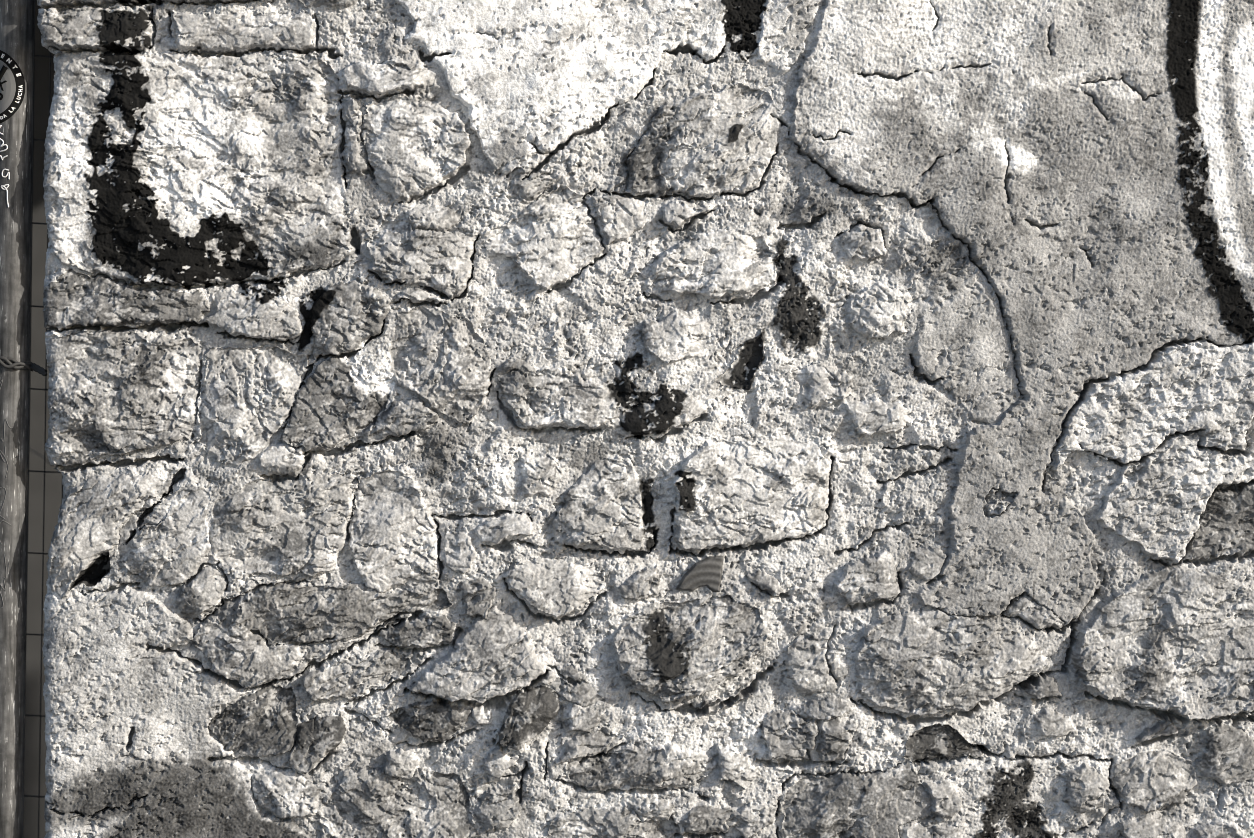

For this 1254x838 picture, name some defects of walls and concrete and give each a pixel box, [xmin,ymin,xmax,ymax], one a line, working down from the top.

crack [930,0,941,32]
crack [1046,26,1054,56]
crack [858,63,992,81]
crack [522,44,726,181]
crack [1081,77,1163,122]
crack [1004,142,1095,268]
crack [583,114,1025,397]
crack [876,443,959,486]
crack [1041,336,1254,570]
peeling [1050,338,1254,564]
spalling [983,487,1018,518]
spalling [69,552,112,591]